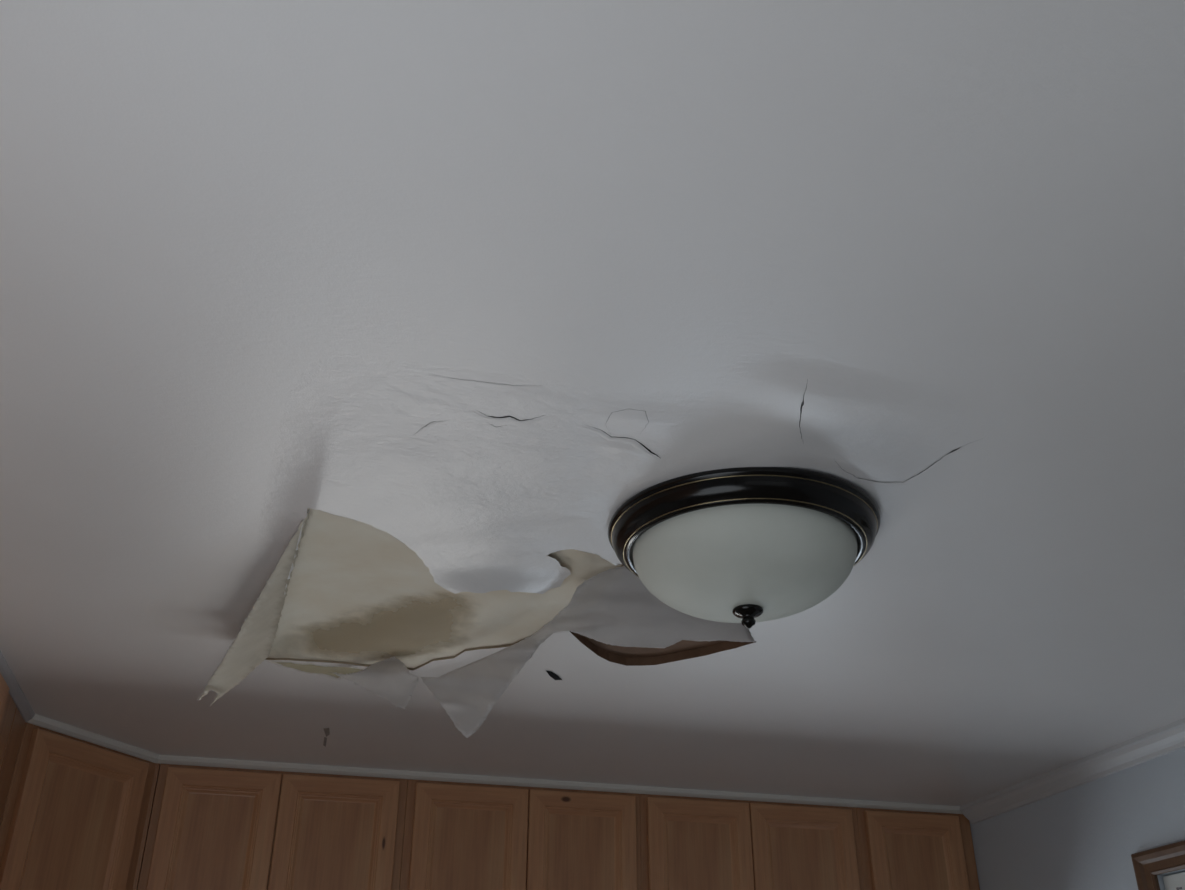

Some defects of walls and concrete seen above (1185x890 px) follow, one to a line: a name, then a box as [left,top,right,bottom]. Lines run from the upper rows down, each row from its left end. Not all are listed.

crack [415,375,548,436]
crack [583,409,660,459]
crack [799,379,808,440]
peeling [198,508,754,738]